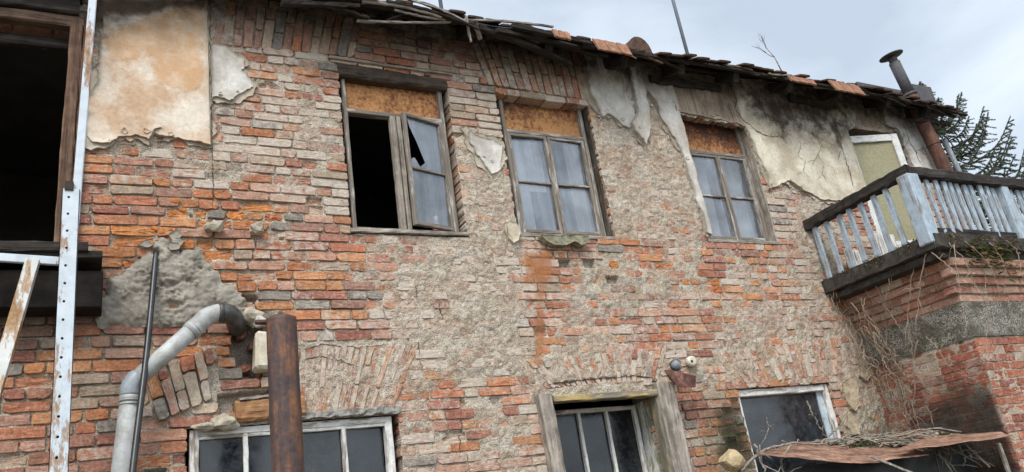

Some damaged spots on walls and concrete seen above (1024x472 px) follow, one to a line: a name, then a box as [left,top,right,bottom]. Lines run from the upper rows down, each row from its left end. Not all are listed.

peeling [85,0,258,151]
peeling [460,126,508,179]
peeling [581,54,867,239]
crack [728,90,853,185]
peeling [137,226,184,251]